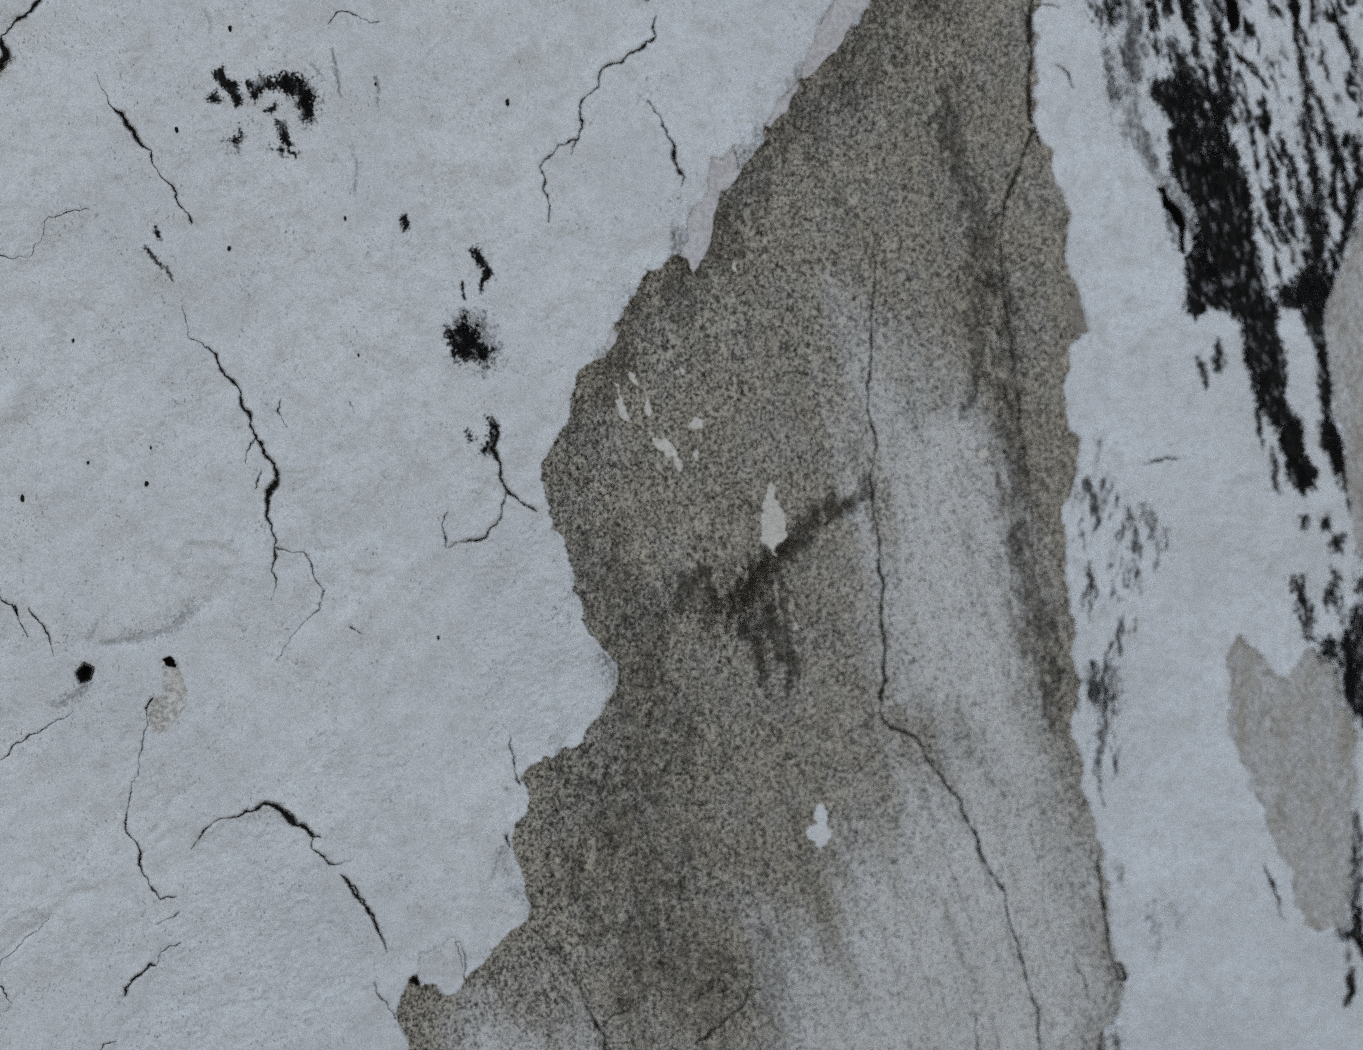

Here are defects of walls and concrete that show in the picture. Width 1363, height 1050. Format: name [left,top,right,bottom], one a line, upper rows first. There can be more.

crack [0,0,41,69]
crack [96,74,192,224]
mould [206,65,319,159]
crack [539,15,657,222]
mould [443,243,502,369]
mould [1088,0,1363,728]
peeling [1325,199,1363,559]
peeling [396,0,1127,1050]
crack [860,249,1041,1050]
peeling [1226,635,1357,932]
crack [191,801,396,1020]
mould [1333,812,1363,1008]